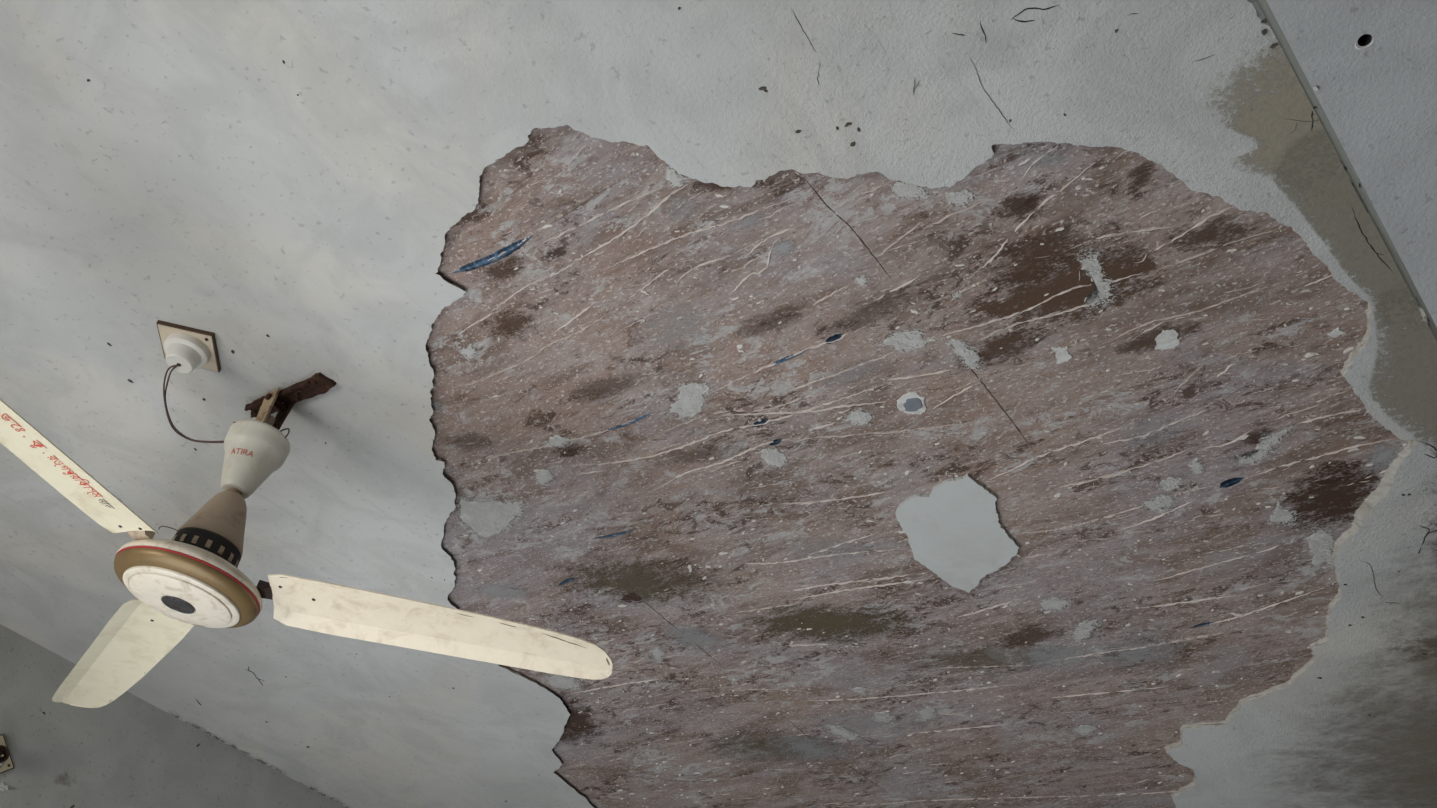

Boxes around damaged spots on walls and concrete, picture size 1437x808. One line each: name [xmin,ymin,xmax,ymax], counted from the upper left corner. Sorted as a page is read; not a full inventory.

damp [1218,42,1437,455]
spalling [425,125,1416,808]
damp [1322,638,1437,808]